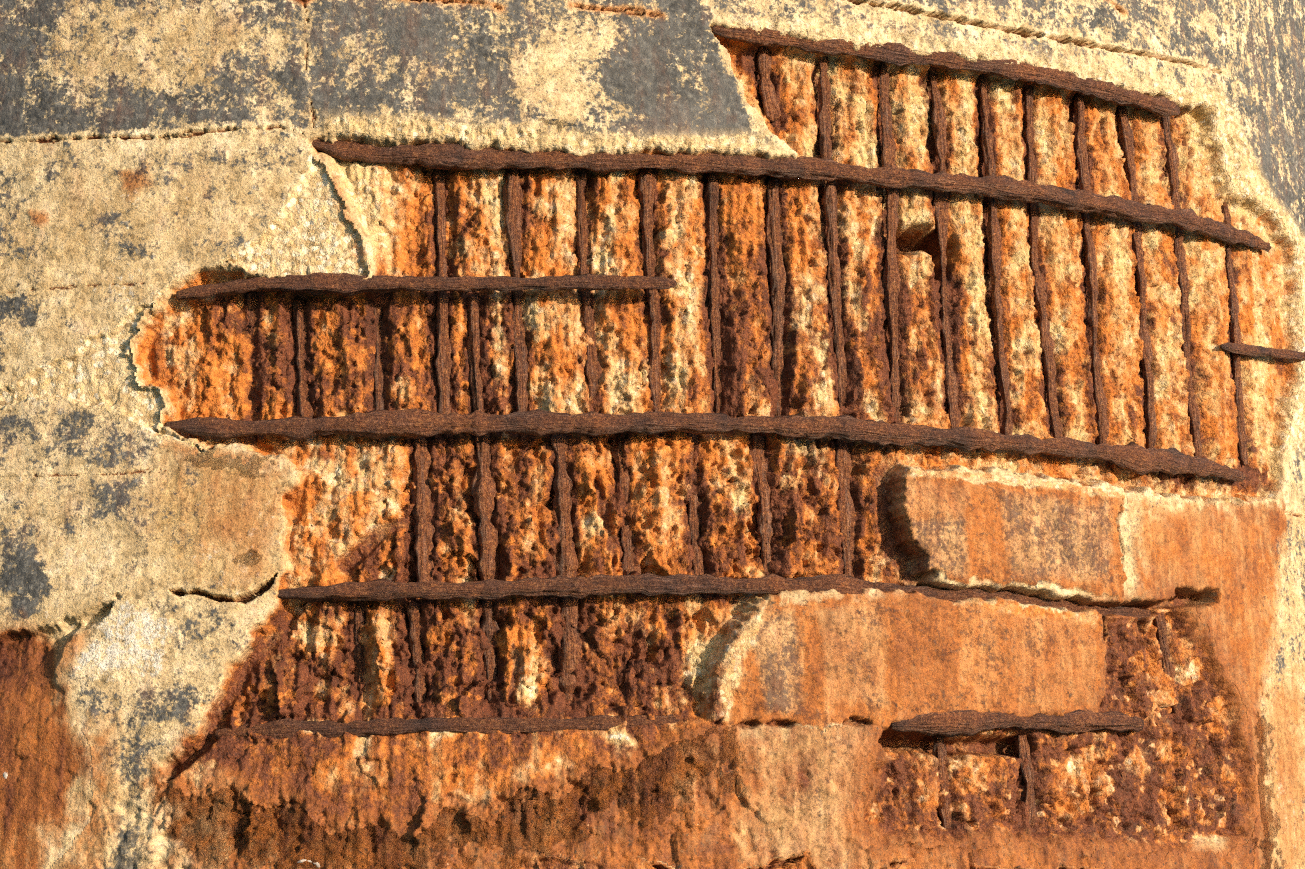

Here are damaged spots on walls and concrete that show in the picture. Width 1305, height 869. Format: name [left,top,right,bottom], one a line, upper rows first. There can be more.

crack [401,0,506,11]
spalling [0,0,1080,453]
spalling [708,10,1305,352]
crack [166,569,279,604]
corrosion [157,435,296,608]
spalling [164,198,1305,861]
spalling [0,590,182,869]
corrosion [51,493,1305,869]
crack [637,856,675,869]
crack [744,852,804,869]
spalling [761,852,816,869]
crack [878,857,916,869]